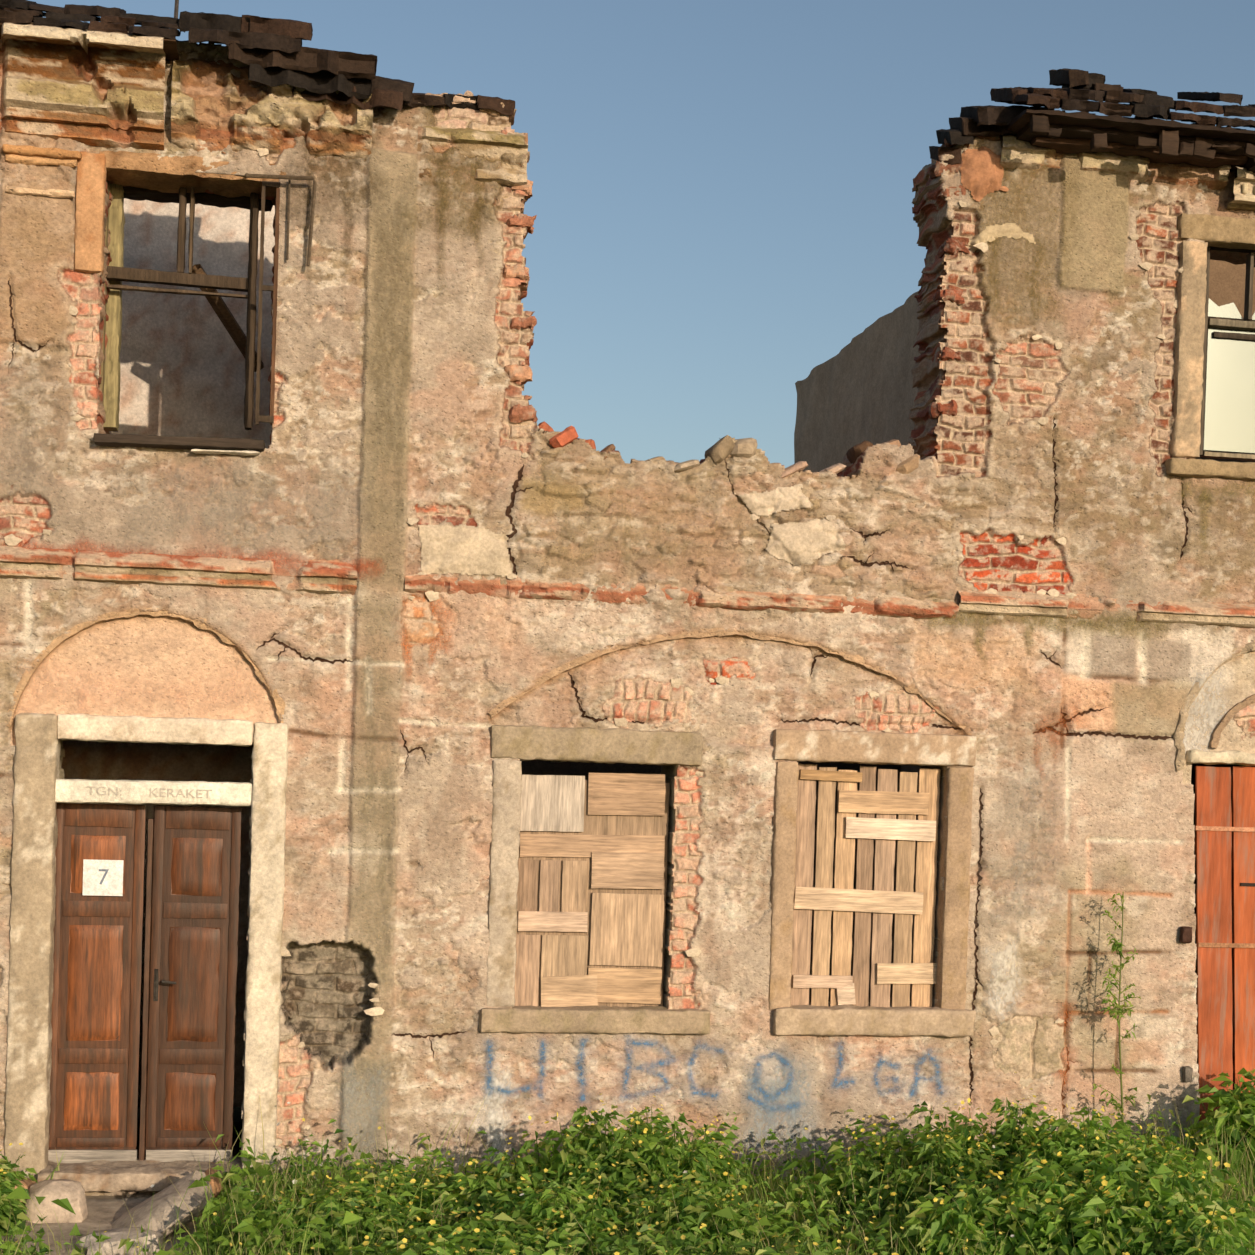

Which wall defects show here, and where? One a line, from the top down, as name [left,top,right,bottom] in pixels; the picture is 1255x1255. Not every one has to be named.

spalling [432,105,516,134]
spalling [492,184,537,461]
spalling [933,201,1070,479]
spalling [1129,200,1187,477]
spalling [0,485,55,546]
crack [505,464,532,576]
crack [719,438,771,550]
spalling [959,528,1077,599]
crack [568,673,644,724]
spalling [603,674,696,728]
spalling [668,765,704,1010]
spalling [276,941,385,1155]